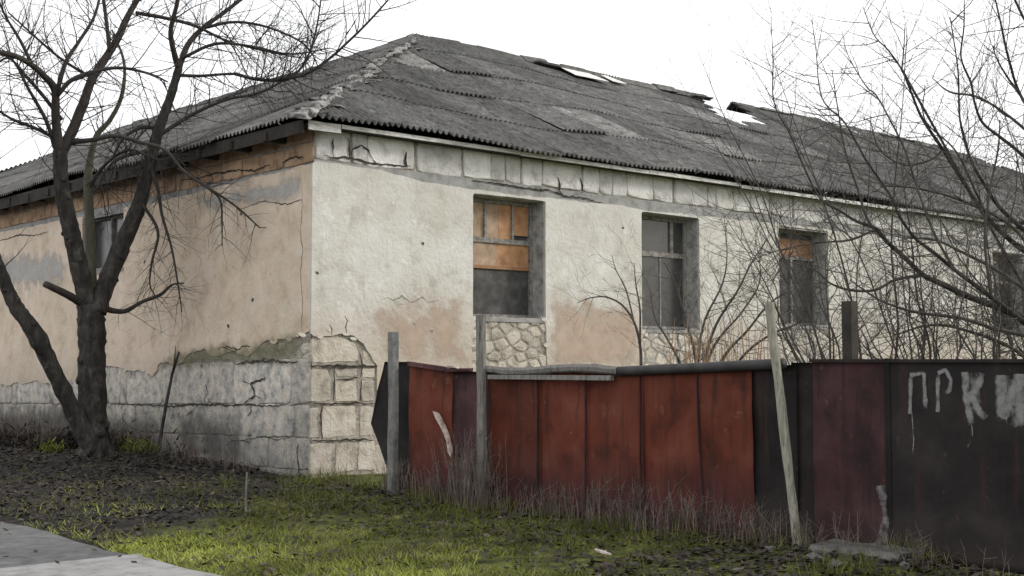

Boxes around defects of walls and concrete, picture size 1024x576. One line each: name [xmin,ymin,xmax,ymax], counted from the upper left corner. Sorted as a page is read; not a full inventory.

crack [182,138,412,185]
crack [473,178,602,203]
peeling [106,329,379,479]
crack [110,317,378,473]